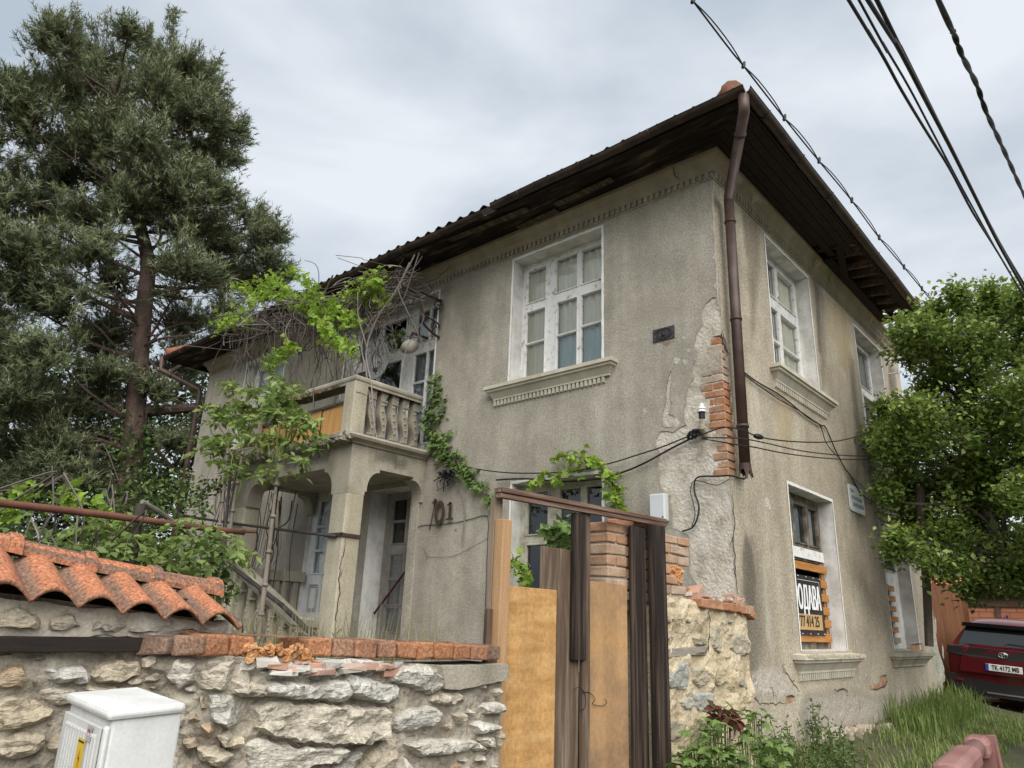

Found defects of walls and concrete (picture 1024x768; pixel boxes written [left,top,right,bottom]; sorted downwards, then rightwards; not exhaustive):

flaking render [656,180,737,597]
crack [333,539,346,636]
crack [754,667,822,706]
flaking render [752,664,898,731]